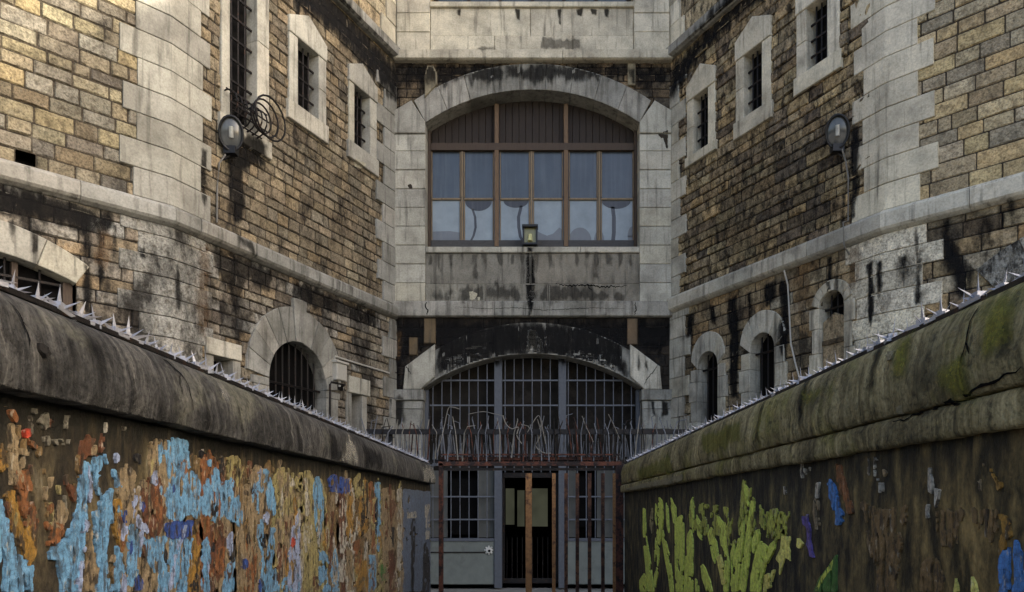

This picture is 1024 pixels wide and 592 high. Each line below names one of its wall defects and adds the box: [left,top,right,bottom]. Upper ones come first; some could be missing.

damp [0,186,116,314]
damp [526,247,535,315]
damp [709,292,752,397]
damp [764,281,790,362]
damp [866,261,882,323]
damp [899,232,922,304]
damp [943,221,974,297]
crack [960,305,980,361]
crack [893,367,1021,422]
peeling [0,406,431,592]
peeling [867,457,888,493]
peeling [919,468,1024,592]